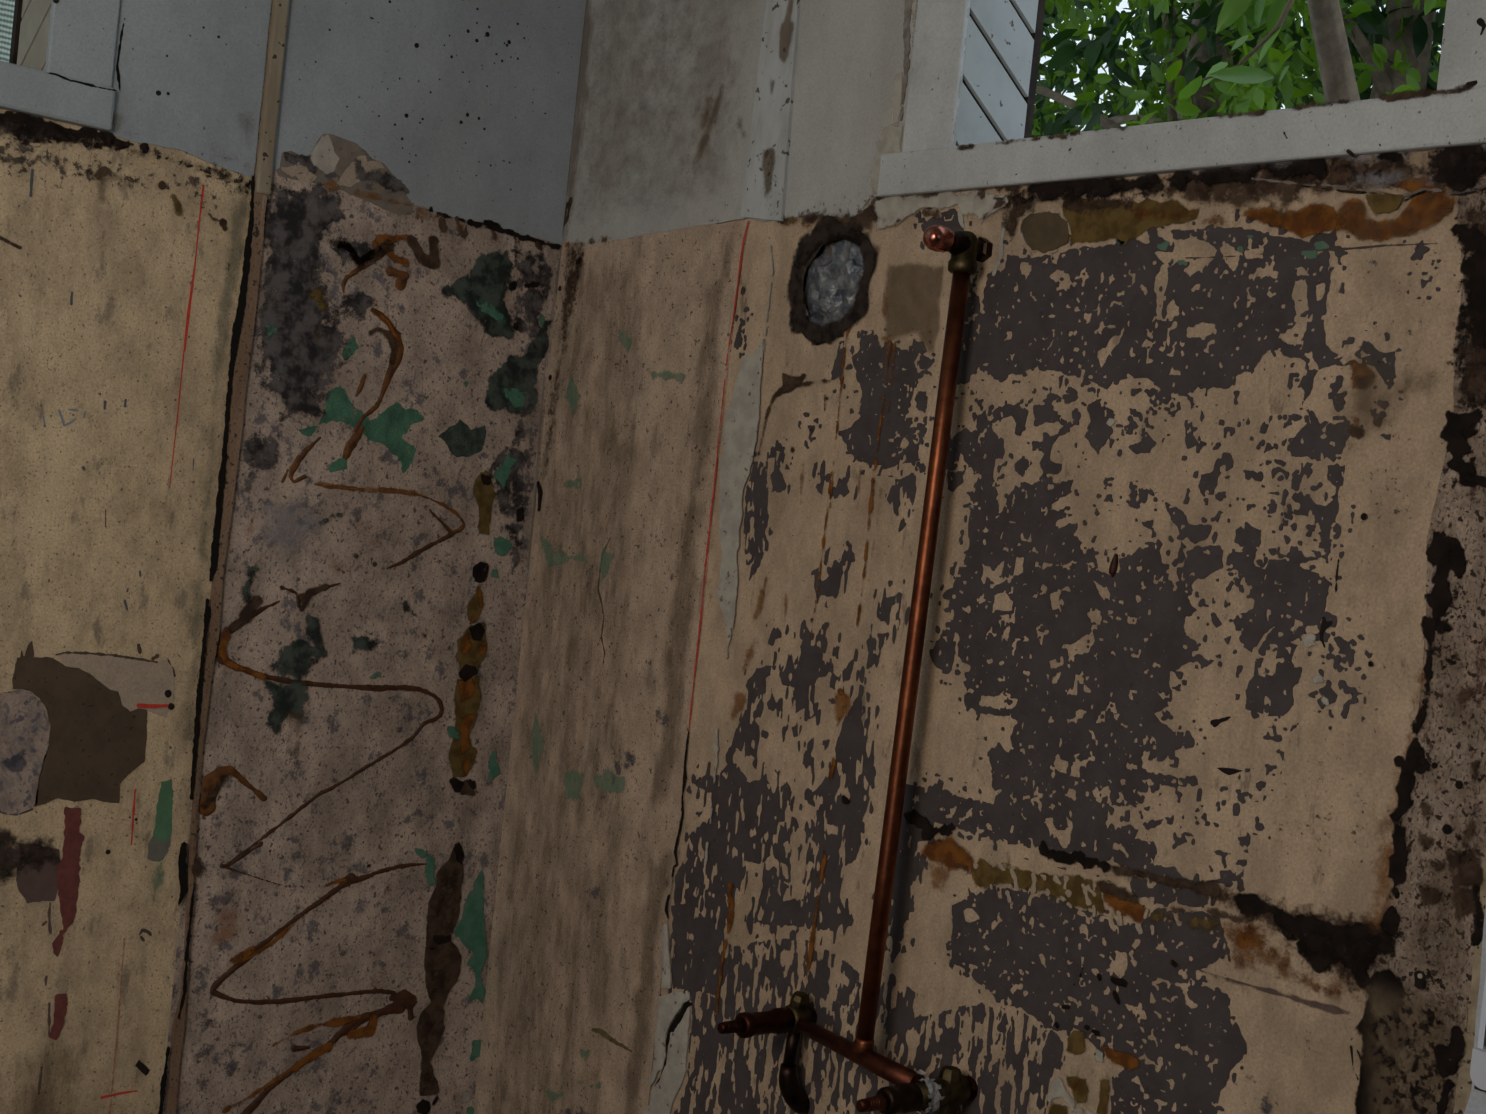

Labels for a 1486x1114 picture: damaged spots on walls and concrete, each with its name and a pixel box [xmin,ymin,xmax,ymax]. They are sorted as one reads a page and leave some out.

damp [444,8,545,87]
damp [0,111,251,336]
damp [243,184,382,491]
peeling [743,440,791,580]
peeling [1033,373,1362,742]
damp [1440,409,1486,496]
damp [0,829,60,882]
peeling [0,641,176,816]
peeling [761,580,910,785]
peeling [885,779,940,963]
damp [971,512,1486,1114]
peeling [643,871,861,1114]